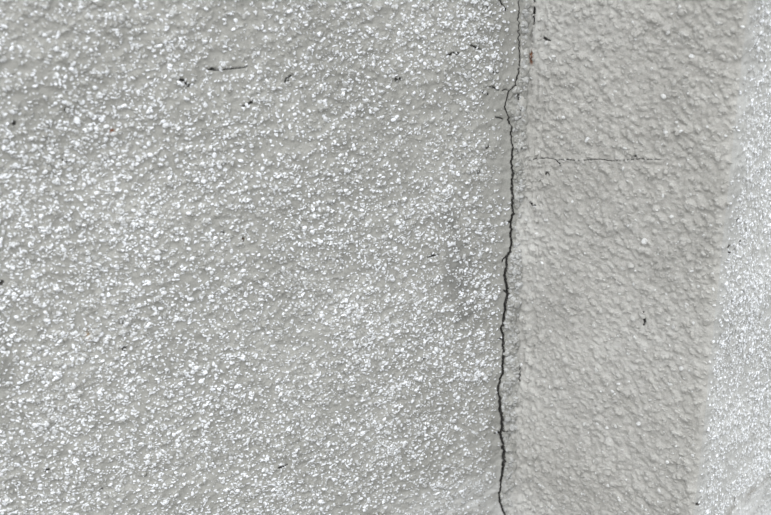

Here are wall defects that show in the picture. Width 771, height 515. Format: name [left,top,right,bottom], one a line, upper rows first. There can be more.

crack [482,0,551,515]